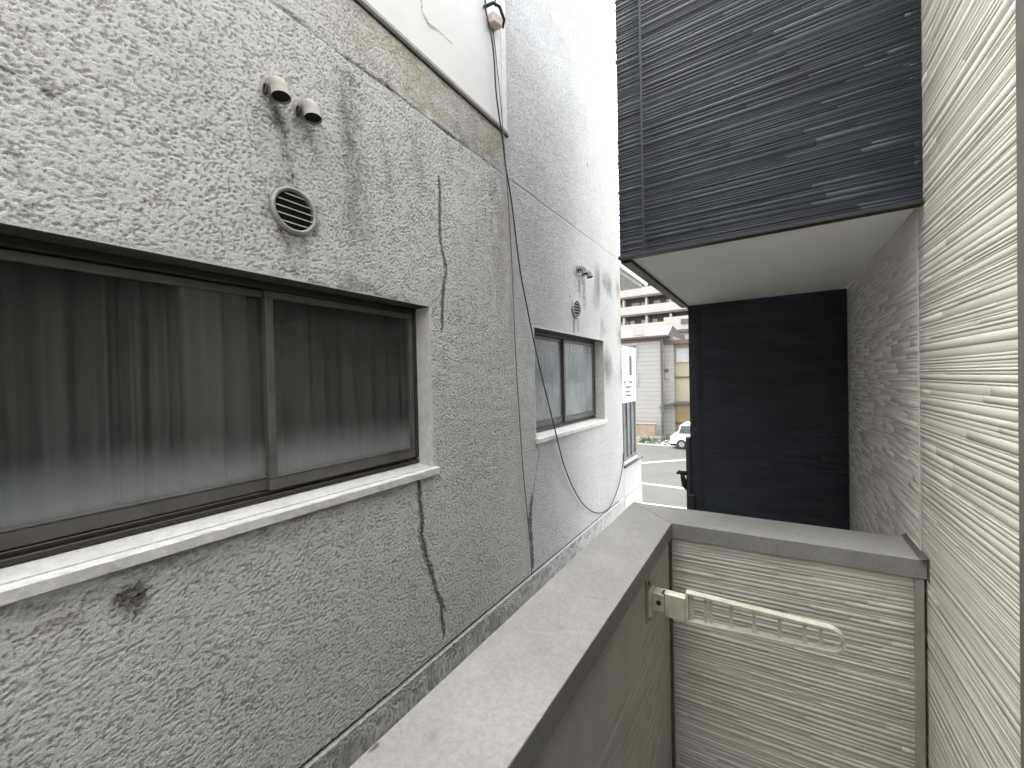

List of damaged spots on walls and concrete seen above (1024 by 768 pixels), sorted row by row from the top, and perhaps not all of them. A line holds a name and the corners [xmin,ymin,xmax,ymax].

crack [431,175,447,332]
crack [396,474,446,638]
crack [528,444,540,569]